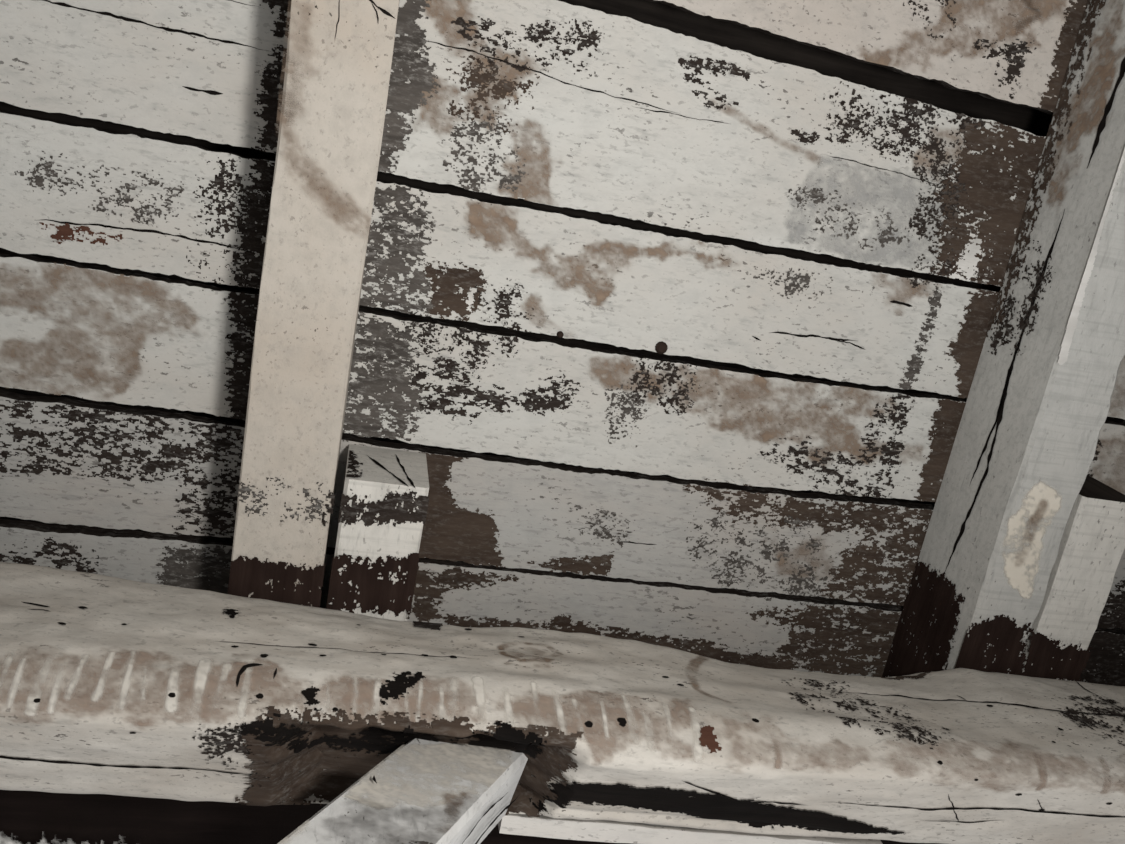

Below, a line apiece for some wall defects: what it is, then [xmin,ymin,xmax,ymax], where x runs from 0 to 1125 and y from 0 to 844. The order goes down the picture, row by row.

peeling [14,151,184,225]
water stain [499,122,550,200]
peeling [39,222,123,245]
water stain [468,203,681,306]
peeling [156,0,1125,750]
water stain [678,368,893,464]
crack [945,210,1065,571]
peeling [0,400,291,539]
peeling [0,537,99,574]
water stain [0,651,298,726]
water stain [324,676,485,728]
water stain [504,682,703,762]